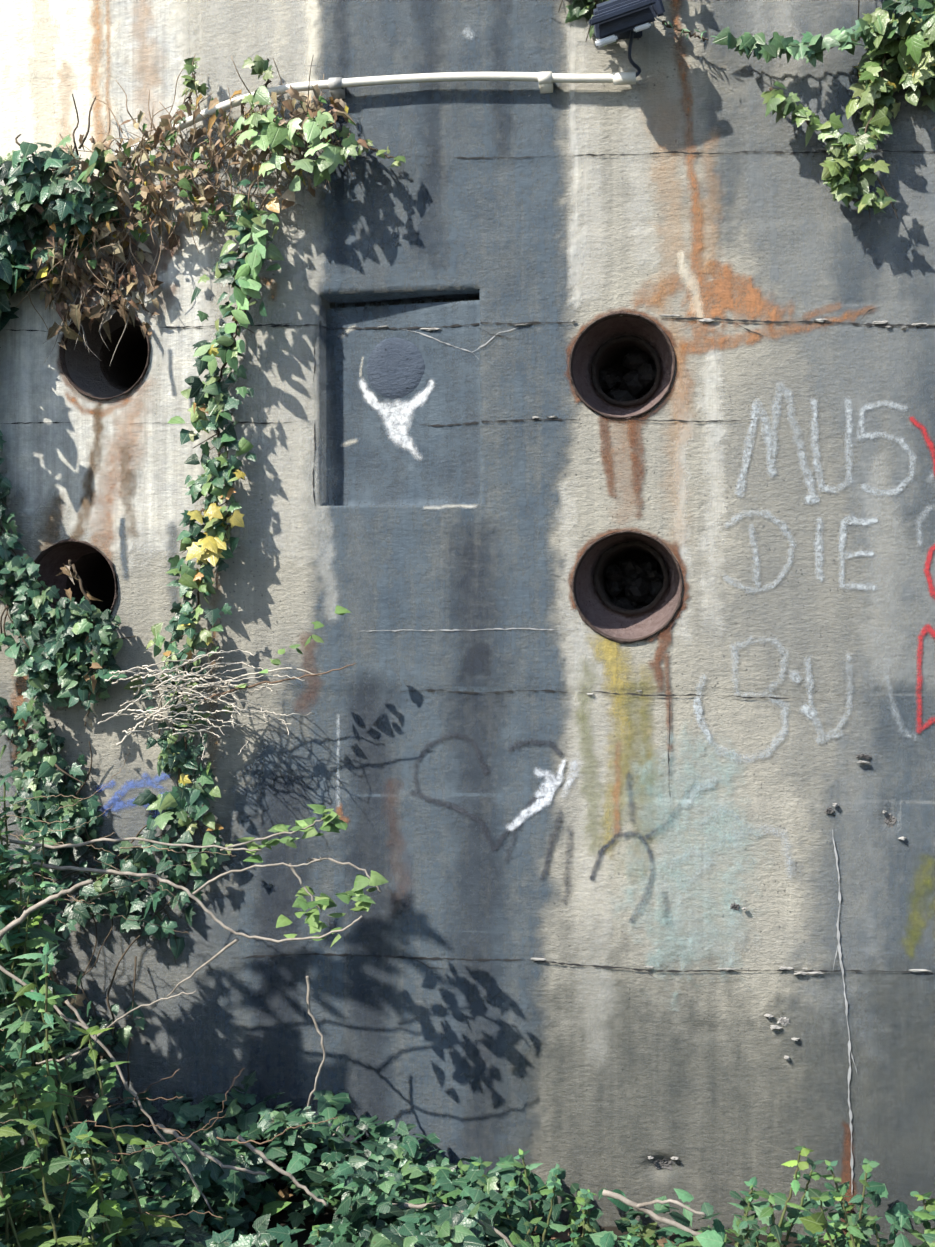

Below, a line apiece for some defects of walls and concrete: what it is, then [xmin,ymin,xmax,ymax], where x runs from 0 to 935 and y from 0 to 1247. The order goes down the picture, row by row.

corrosion [92,0,110,151]
damp [307,0,562,82]
damp [0,0,215,578]
corrosion [566,46,863,402]
crack [658,306,935,336]
corrosion [57,357,136,551]
corrosion [600,417,612,495]
corrosion [628,413,647,505]
damp [66,81,580,1179]
damp [537,0,935,1246]
damp [0,729,80,930]
crack [244,828,931,1192]